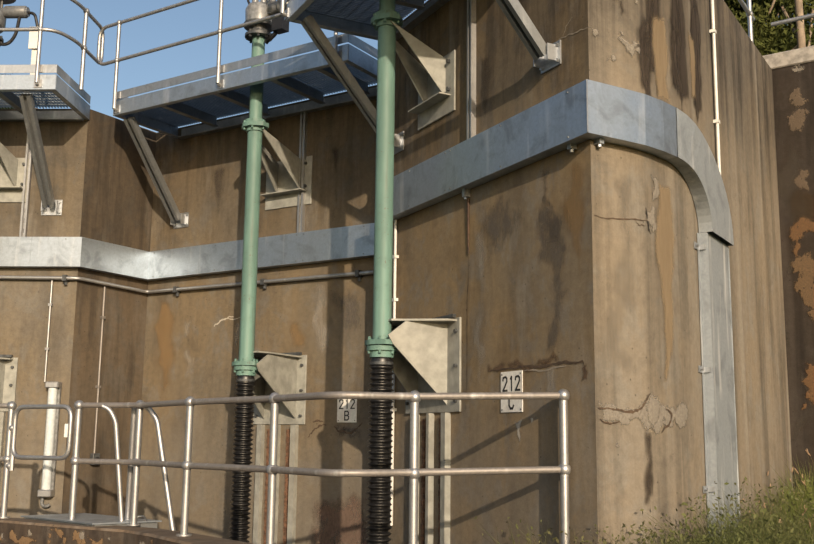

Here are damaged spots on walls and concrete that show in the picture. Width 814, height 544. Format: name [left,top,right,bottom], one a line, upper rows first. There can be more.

damp [639,0,701,121]
peeling [793,169,810,191]
crack [594,215,647,226]
damp [539,189,566,347]
peeling [789,216,814,320]
crack [488,352,586,374]
peeling [801,363,814,410]
peeling [0,530,36,544]
peeling [47,527,110,544]